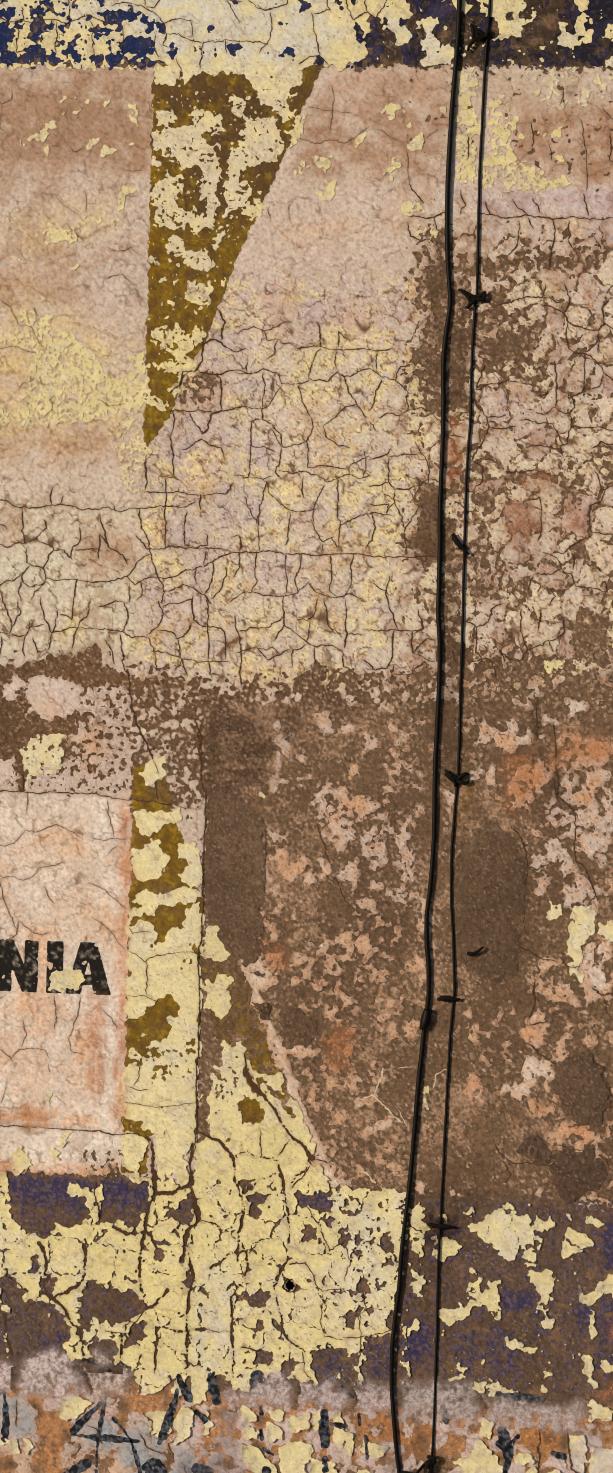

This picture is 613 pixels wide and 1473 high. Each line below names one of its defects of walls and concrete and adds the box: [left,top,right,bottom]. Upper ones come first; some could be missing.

crack [297,88,466,244]
crack [56,197,139,284]
peeling [0,0,613,493]
crack [471,116,613,491]
flaking render [411,587,436,624]
crack [452,472,613,673]
flaking render [67,775,134,798]
flaking render [594,754,613,821]
crack [0,299,461,1385]
peeling [48,964,85,994]
flaking render [0,1438,20,1473]
flaking render [83,1447,120,1473]